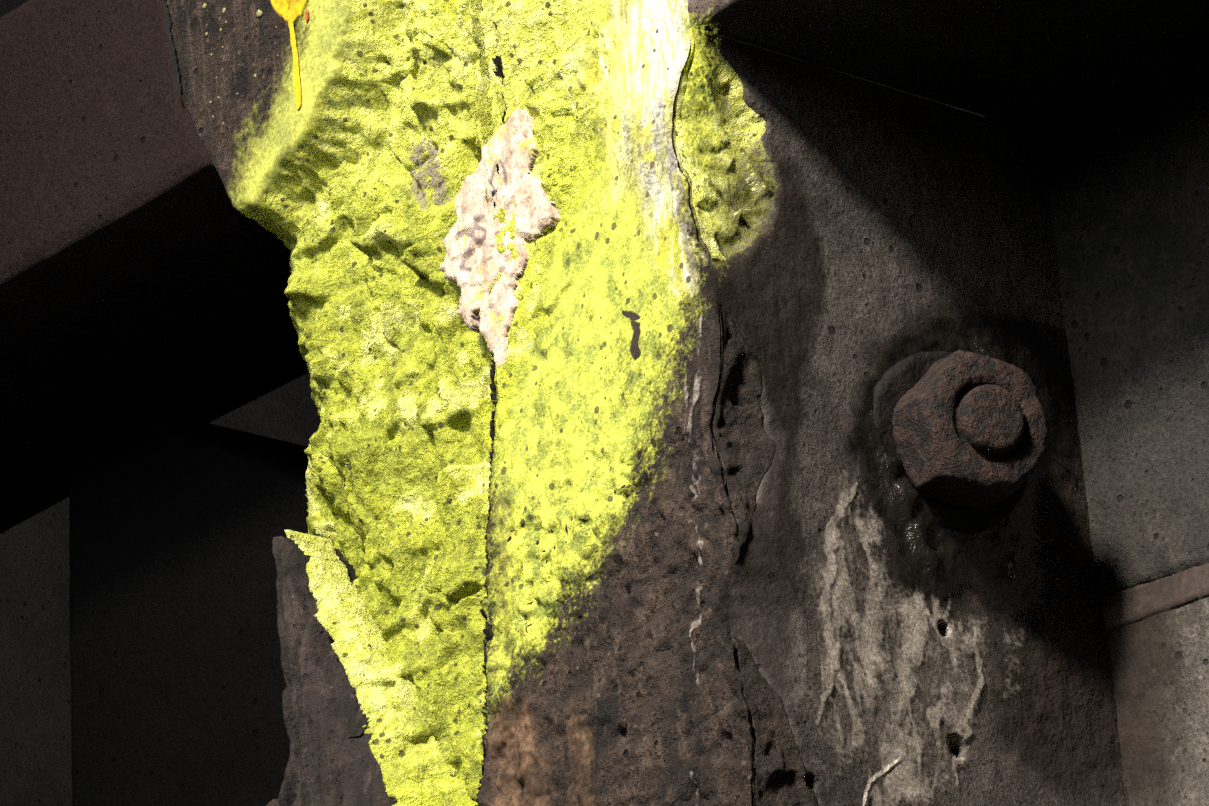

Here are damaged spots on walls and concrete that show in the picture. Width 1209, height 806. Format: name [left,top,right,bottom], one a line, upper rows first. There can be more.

spalling [236,0,610,806]
crack [475,353,498,806]
efflorescence [815,474,985,806]